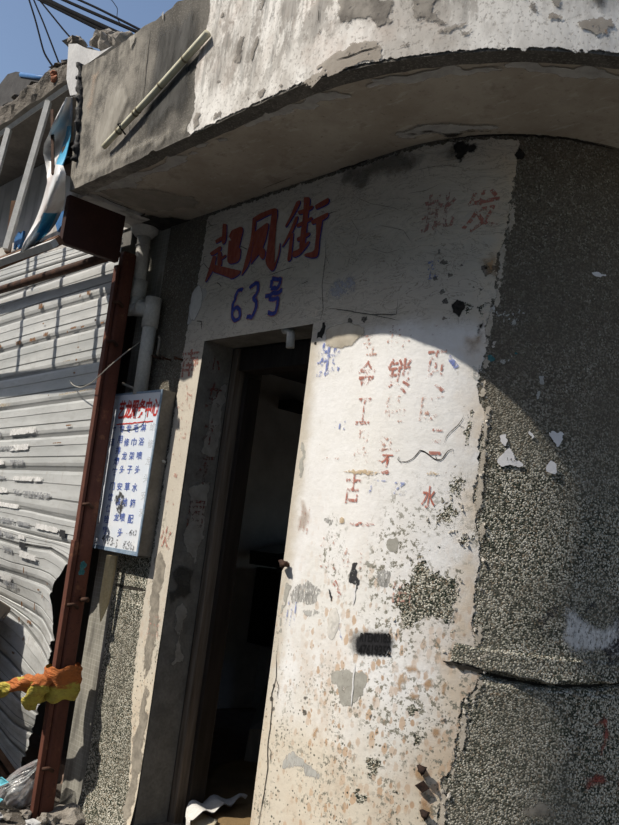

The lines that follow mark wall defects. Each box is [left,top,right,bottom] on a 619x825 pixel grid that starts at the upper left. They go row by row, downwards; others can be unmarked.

peeling [337,0,393,26]
peeling [412,0,471,35]
peeling [529,0,562,19]
peeling [573,17,614,35]
peeling [245,41,382,127]
peeling [377,553,463,661]
crack [258,641,279,825]